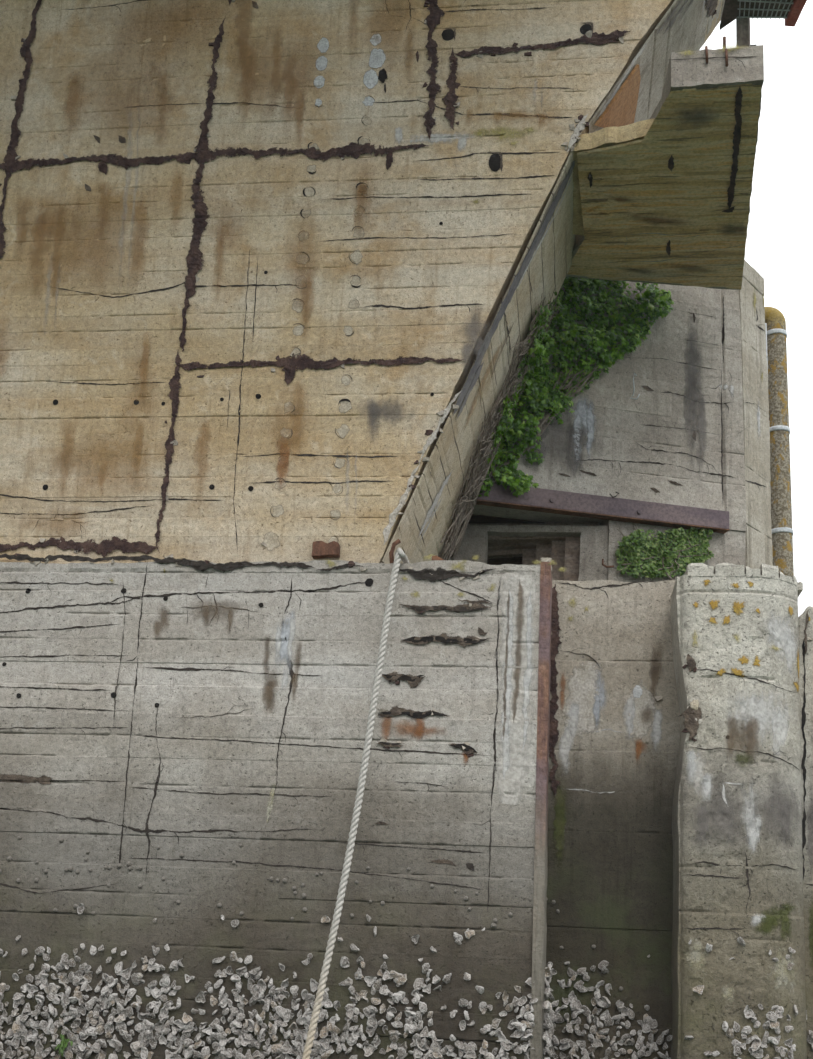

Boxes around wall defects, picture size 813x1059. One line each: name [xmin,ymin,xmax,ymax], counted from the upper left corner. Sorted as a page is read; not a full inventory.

crack [126,101,321,109]
crack [361,86,573,141]
crack [298,151,560,354]
corrosion [278,442,289,479]
crack [0,250,501,913]
spalling [399,599,492,614]
spalling [400,627,488,648]
spalling [382,670,425,688]
spalling [378,706,450,718]
corrosion [383,717,427,737]
leakage [729,697,787,764]
spalling [449,742,478,757]